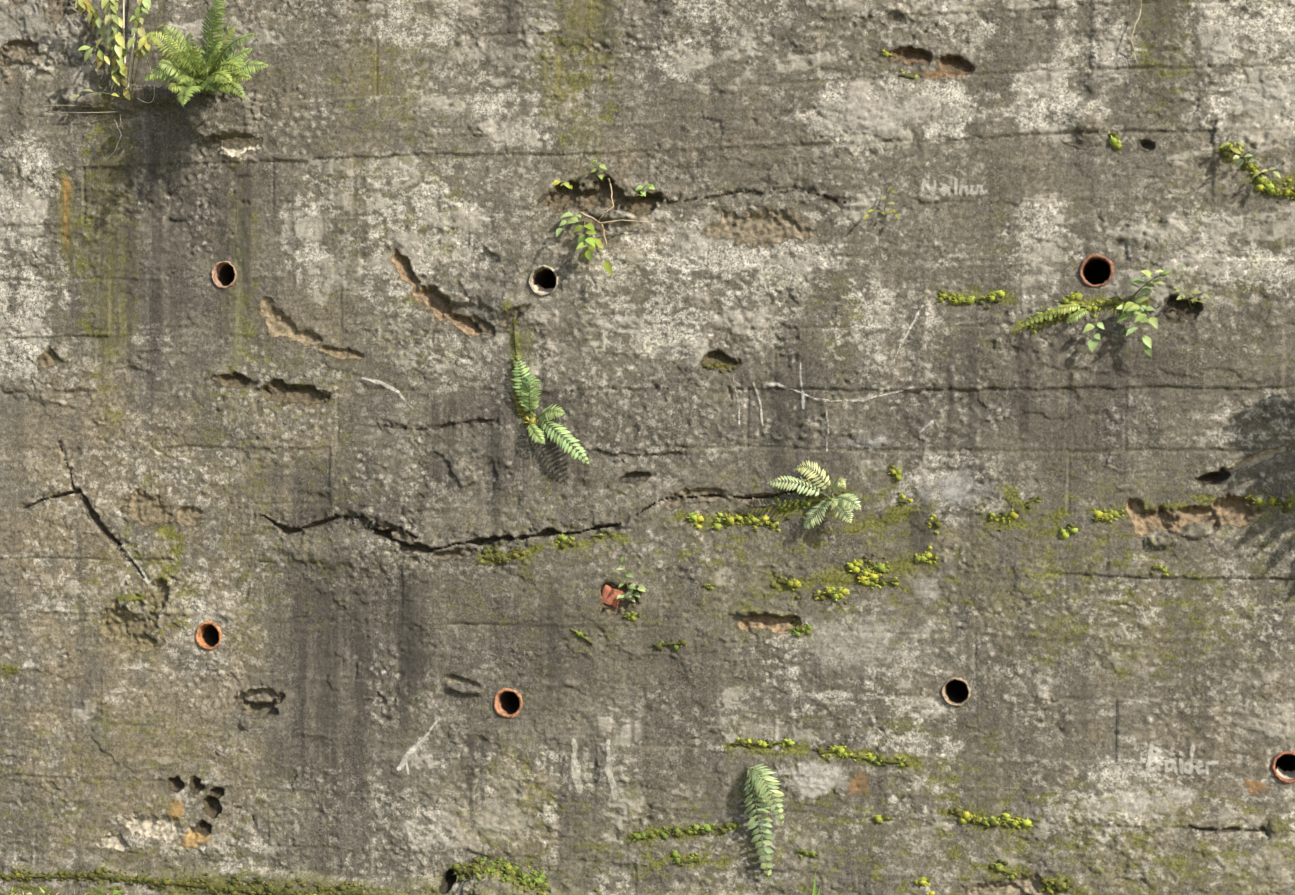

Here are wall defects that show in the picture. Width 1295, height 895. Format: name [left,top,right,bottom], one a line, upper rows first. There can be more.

spalling [886,46,975,76]
spalling [386,247,535,337]
spalling [257,297,364,360]
crack [23,441,145,578]
crack [264,490,796,554]
spalling [1125,494,1261,549]
water stain [397,720,438,774]
spalling [92,776,224,852]